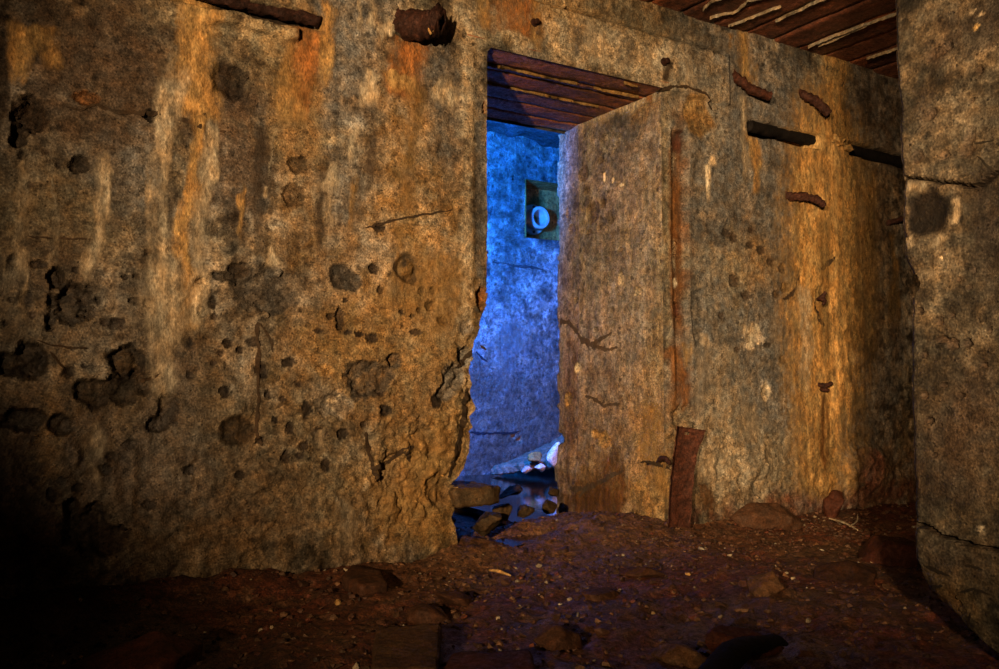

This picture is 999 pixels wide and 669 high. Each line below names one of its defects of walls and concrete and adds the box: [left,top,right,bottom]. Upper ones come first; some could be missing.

rust [199,0,334,117]
spalling [8,92,52,161]
crack [655,85,712,110]
crack [365,209,452,228]
rust [780,55,863,496]
damp [908,182,927,190]
damp [929,235,946,249]
damp [952,198,960,224]
spalling [0,253,182,437]
crack [560,318,617,352]
spalling [375,345,473,512]
rust [668,426,706,528]